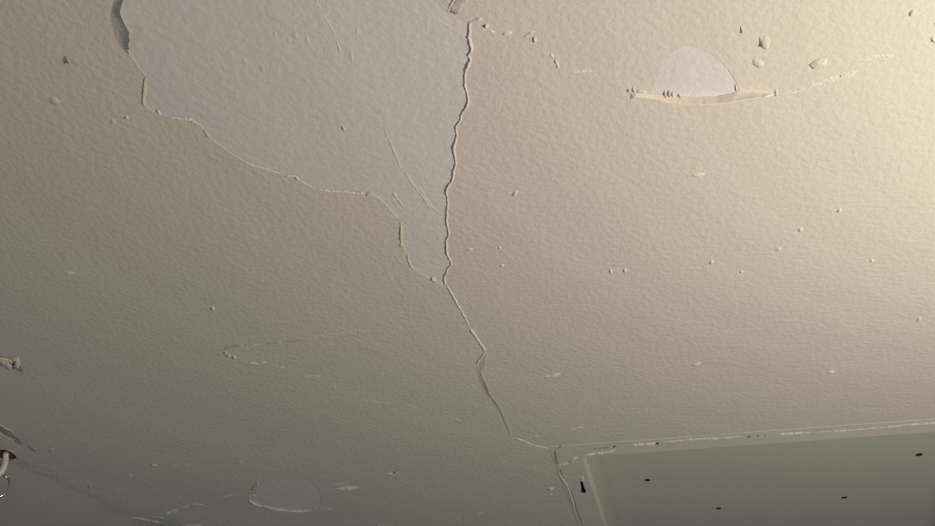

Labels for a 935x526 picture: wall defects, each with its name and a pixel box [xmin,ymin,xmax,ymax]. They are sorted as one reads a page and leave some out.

peeling [627,47,778,105]
peeling [110,0,482,285]
spalling [0,357,20,370]